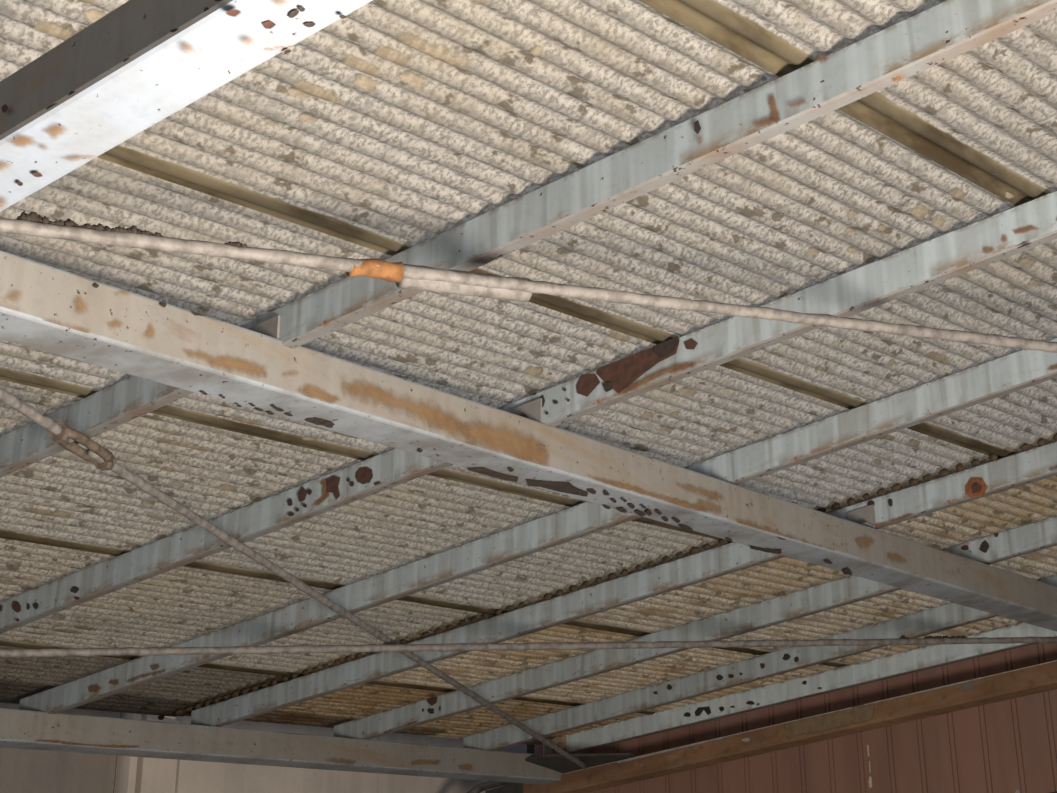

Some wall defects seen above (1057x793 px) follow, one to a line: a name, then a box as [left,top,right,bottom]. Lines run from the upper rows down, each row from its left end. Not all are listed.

corrosion [756,95,779,125]
corrosion [13,137,46,149]
corrosion [576,337,698,396]
corrosion [287,467,380,516]
corrosion [965,477,987,498]
corrosion [0,601,38,622]